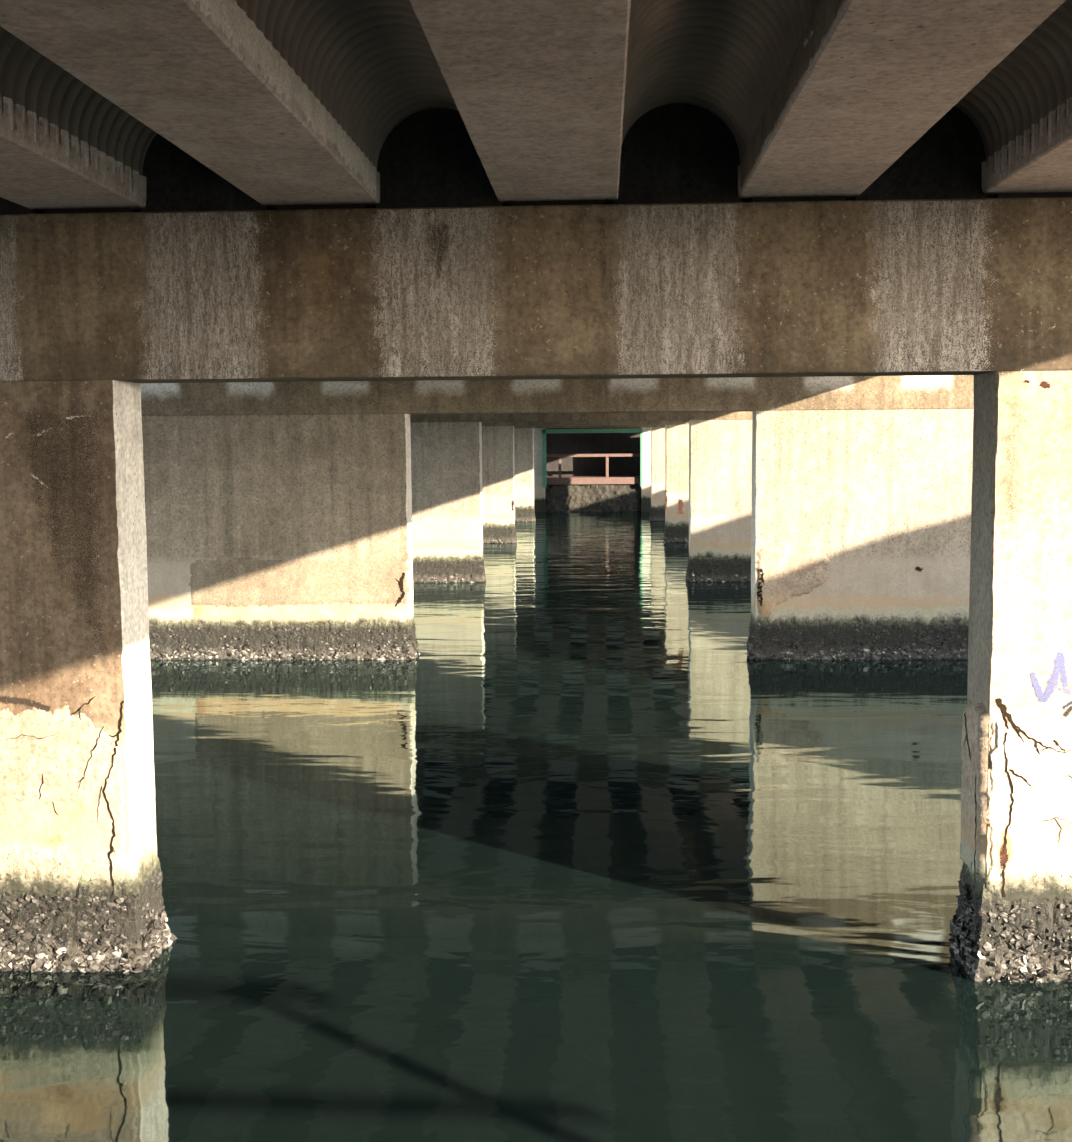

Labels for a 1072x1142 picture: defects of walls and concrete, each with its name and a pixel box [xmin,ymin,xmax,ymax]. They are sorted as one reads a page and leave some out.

water stain [588,204,764,375]
water stain [846,200,1007,372]
spalling [0,705,127,894]
crack [6,696,124,886]
crack [963,698,1072,897]
spalling [985,712,1072,902]